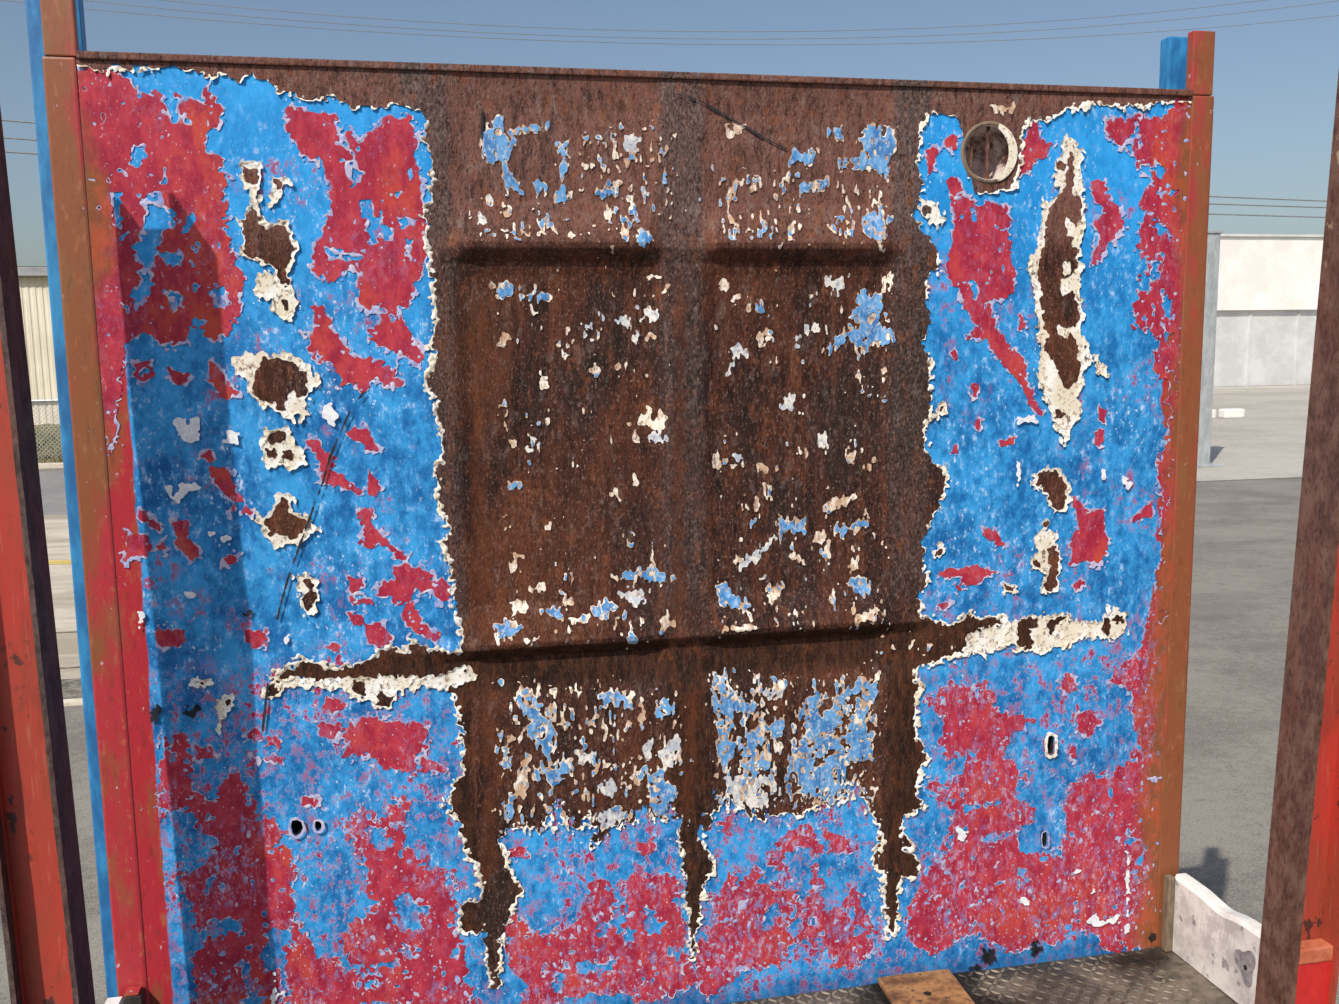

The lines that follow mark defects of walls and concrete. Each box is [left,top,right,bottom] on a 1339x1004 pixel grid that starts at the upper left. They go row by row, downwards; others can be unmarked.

peeling [281,102,427,394]
peeling [489,280,559,330]
peeling [469,114,686,268]
peeling [556,274,670,444]
peeling [719,278,778,376]
peeling [711,121,898,253]
peeling [794,271,896,403]
peeling [303,420,453,654]
peeling [497,399,550,490]
rust [76,59,1192,989]
peeling [902,105,1191,958]
peeling [491,431,953,1004]